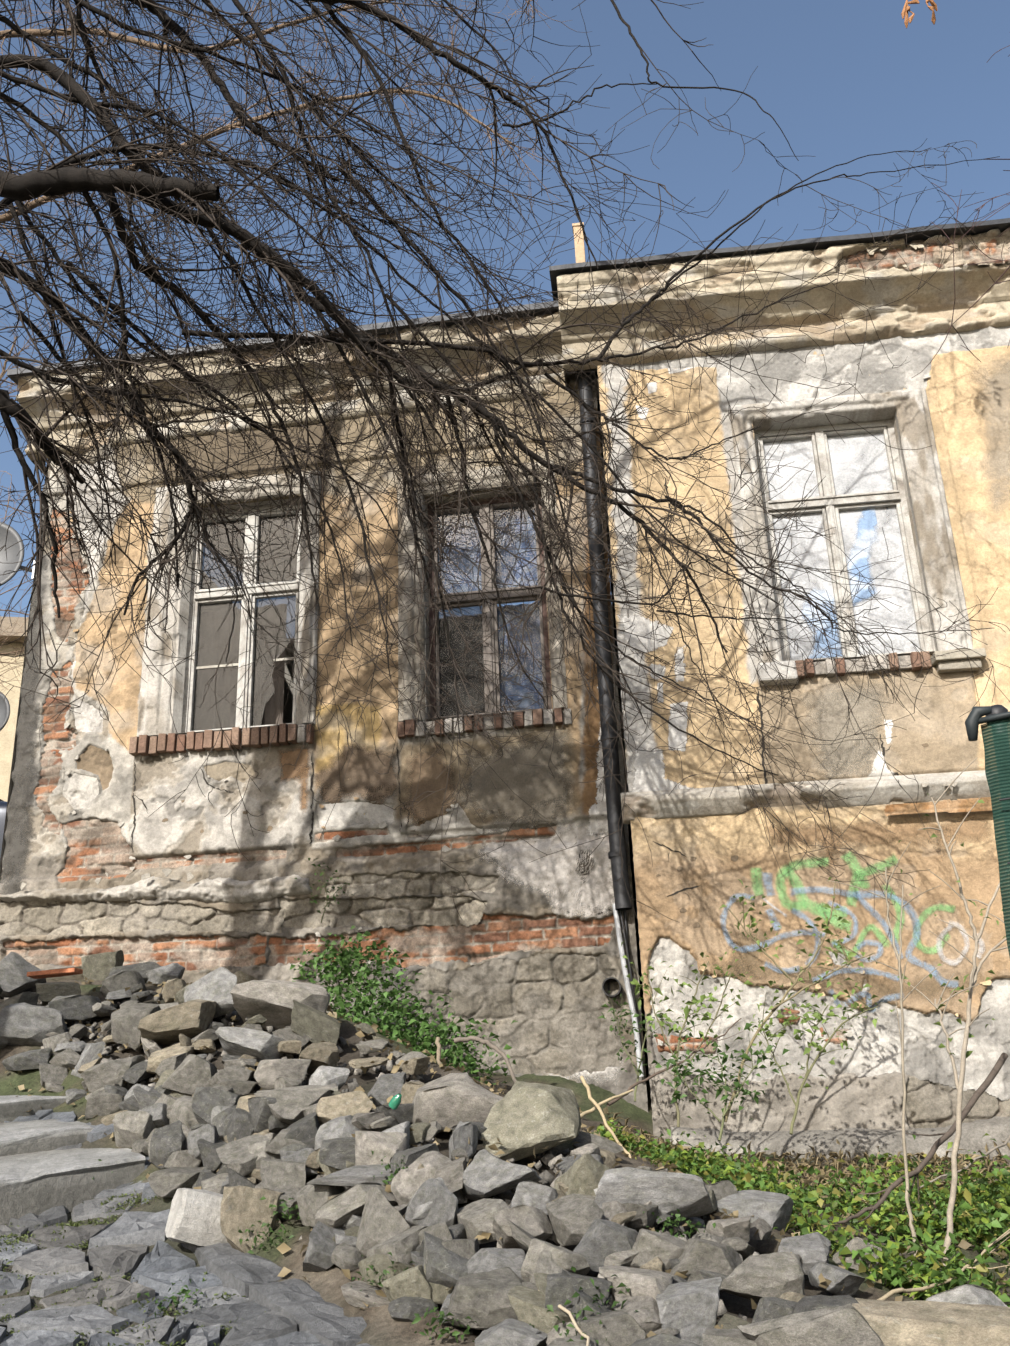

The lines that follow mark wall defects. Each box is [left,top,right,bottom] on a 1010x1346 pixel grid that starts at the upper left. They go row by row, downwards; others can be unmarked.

flaking render [836,234,1010,274]
spalling [613,326,1010,420]
flaking render [33,459,287,883]
peeling [617,614,693,792]
flaking render [3,914,615,972]
spalling [649,938,1010,1101]